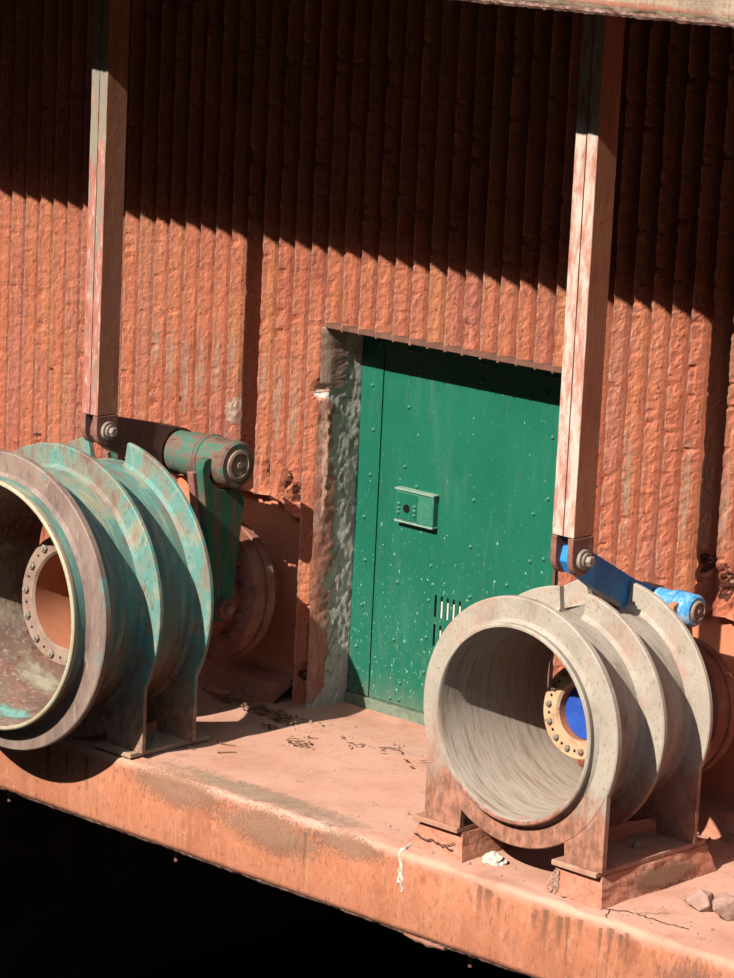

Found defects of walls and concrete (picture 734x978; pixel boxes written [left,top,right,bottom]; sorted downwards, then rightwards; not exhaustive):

corrosion [568,0,706,14]
peeling [153,323,236,416]
peeling [260,352,298,454]
spalling [282,473,302,502]
peeling [298,328,351,705]
peeling [621,428,632,533]
peeling [681,441,734,602]
damp [397,843,413,892]
crack [414,833,454,851]
crack [604,908,689,929]